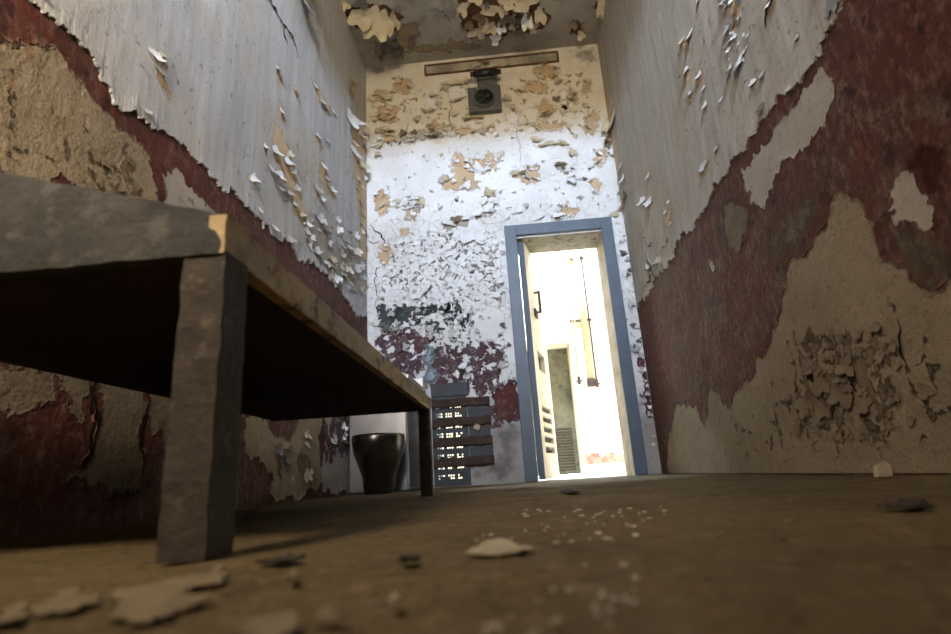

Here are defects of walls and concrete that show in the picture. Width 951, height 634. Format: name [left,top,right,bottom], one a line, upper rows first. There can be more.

crack [268,0,298,58]
peeling [0,0,951,477]
peeling [0,362,171,502]
peeling [240,414,349,503]